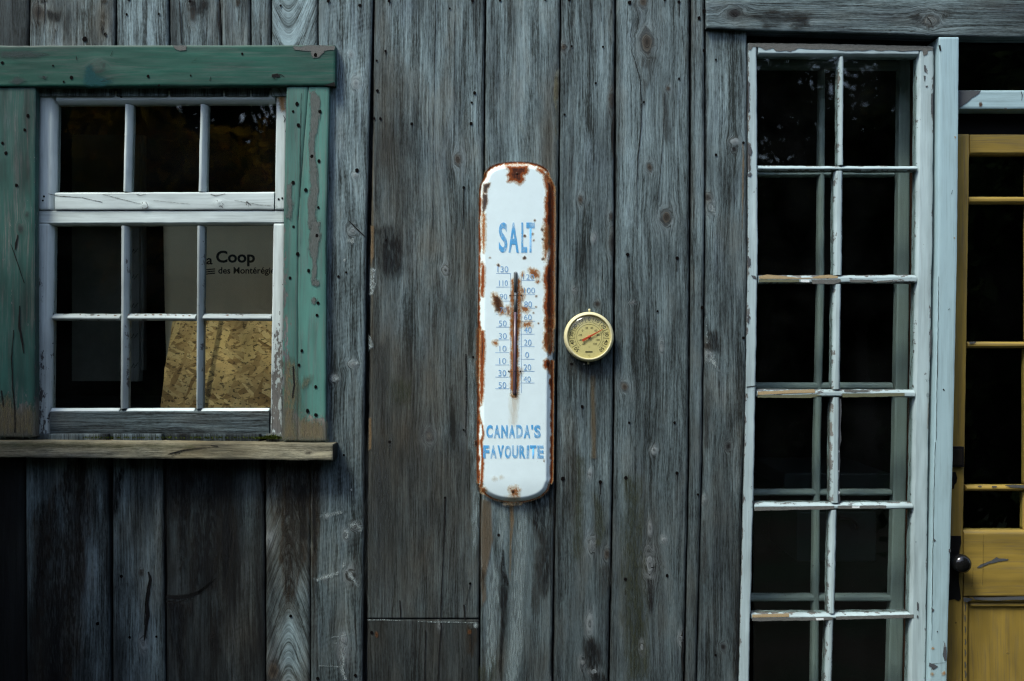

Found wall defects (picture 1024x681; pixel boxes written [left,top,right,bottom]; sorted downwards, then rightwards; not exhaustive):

peeling [285,184,293,221]
peeling [307,82,335,305]
peeling [747,256,893,284]
rust [475,162,555,574]
peeling [754,389,905,511]
peeling [752,602,934,621]